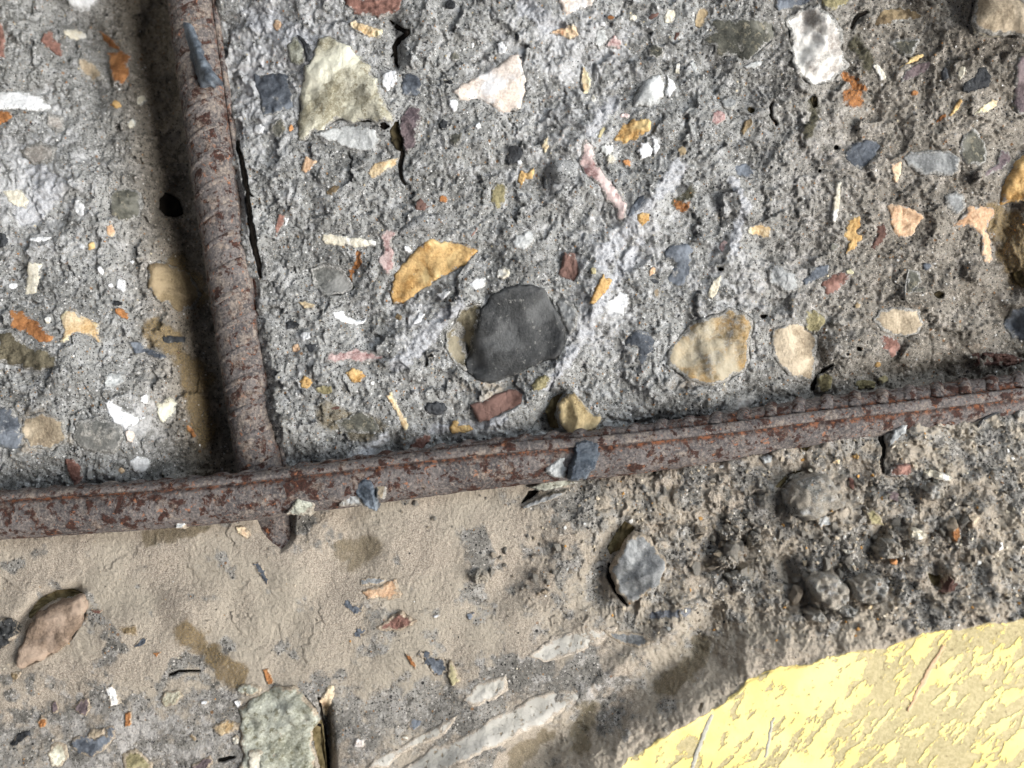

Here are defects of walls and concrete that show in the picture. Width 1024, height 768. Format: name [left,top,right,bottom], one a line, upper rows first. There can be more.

crack [390,20,410,67]
spalling [0,0,288,490]
crack [236,140,261,278]
crack [398,150,406,184]
spalling [216,0,1024,466]
rust [143,317,217,448]
spalling [0,371,1024,768]